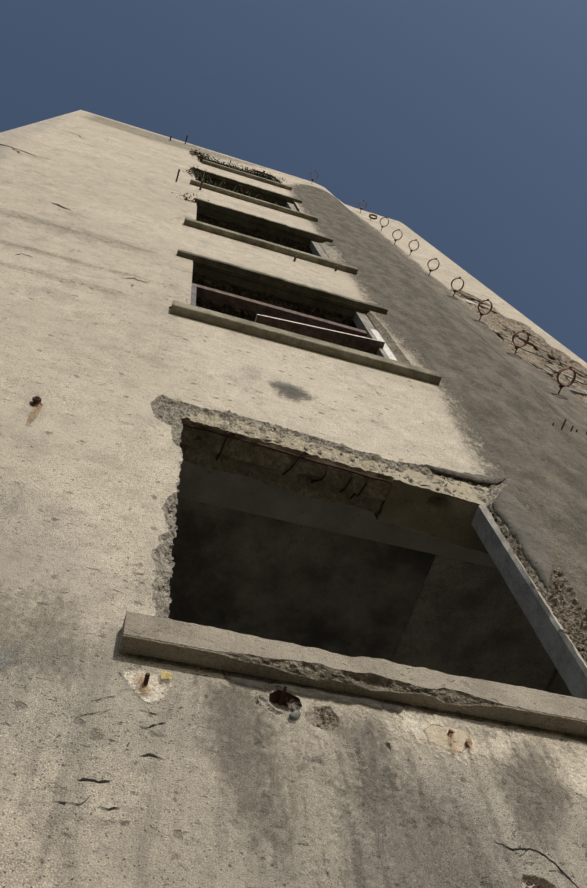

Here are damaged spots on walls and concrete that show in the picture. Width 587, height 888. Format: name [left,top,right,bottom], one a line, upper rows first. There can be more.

spalling [445,287,587,403]
spalling [150,395,587,665]
spalling [305,706,340,731]
damp [336,707,587,834]
crack [494,838,583,888]